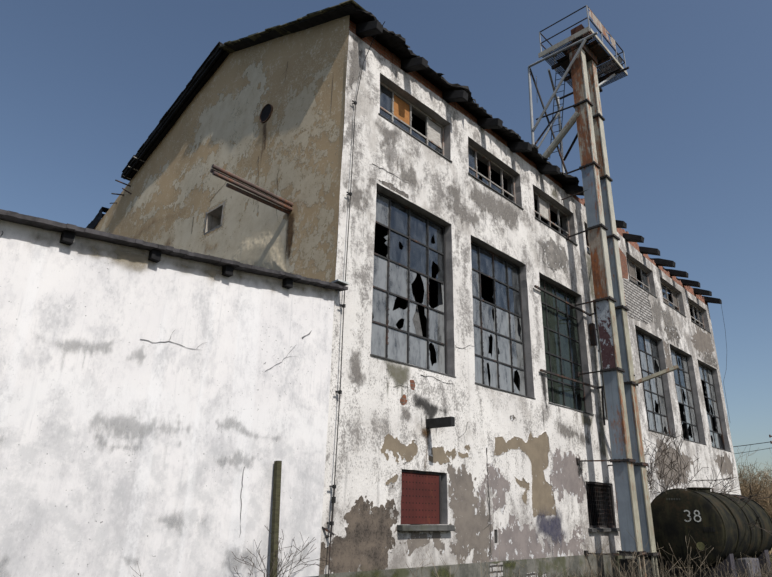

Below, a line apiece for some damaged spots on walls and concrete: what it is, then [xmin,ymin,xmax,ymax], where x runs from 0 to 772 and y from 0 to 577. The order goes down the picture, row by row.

water stain [349,41,364,89]
water stain [381,125,401,146]
peeling [125,52,340,282]
water stain [344,178,375,210]
water stain [401,165,422,188]
water stain [447,183,518,232]
peeling [319,430,587,577]